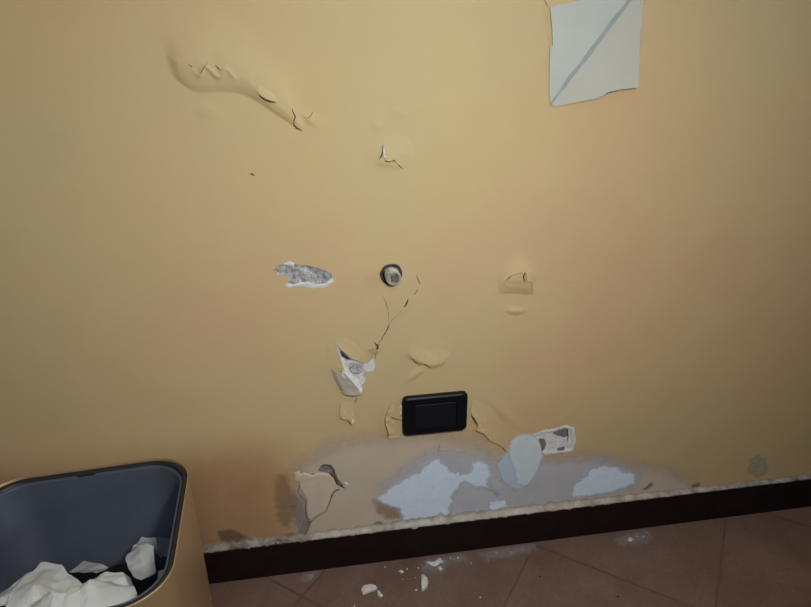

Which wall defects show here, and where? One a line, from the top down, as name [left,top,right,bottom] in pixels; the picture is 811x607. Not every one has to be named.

flaking render [272,261,334,289]
crack [364,277,420,362]
peeling [325,336,375,425]
peeling [385,403,403,439]
flaking render [533,425,576,455]
damp [298,435,691,536]
flaking render [206,464,811,552]